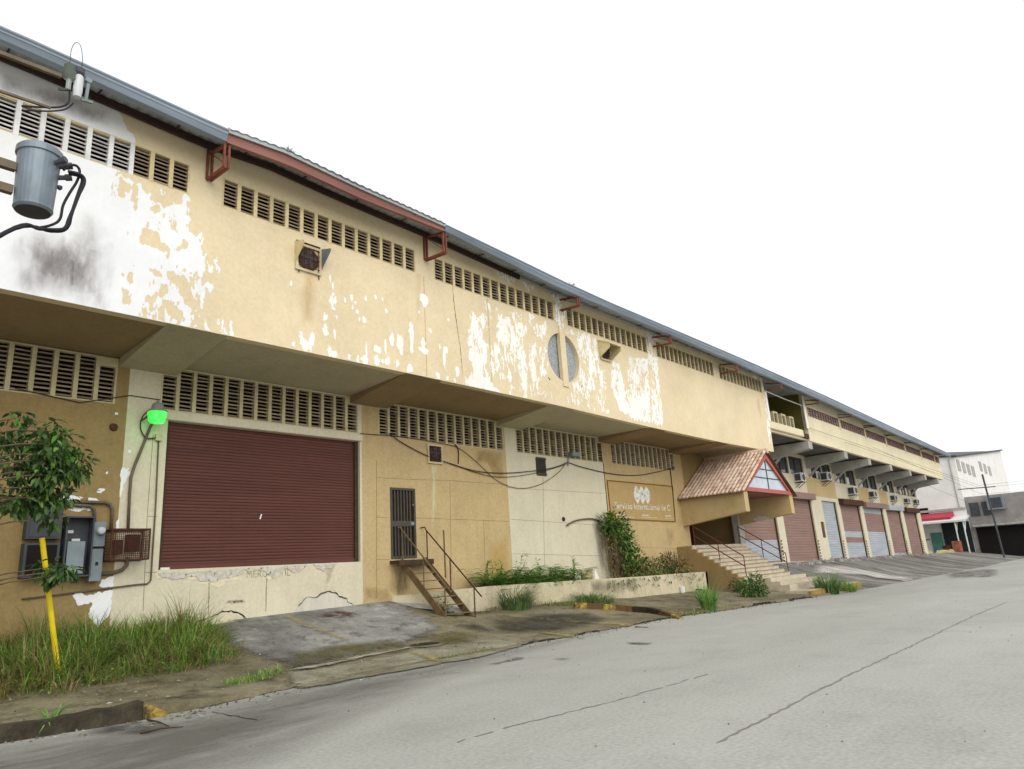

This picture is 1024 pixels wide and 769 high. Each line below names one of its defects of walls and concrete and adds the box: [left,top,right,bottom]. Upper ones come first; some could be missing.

peeling [0,61,136,143]
peeling [0,130,234,336]
damp [42,252,83,279]
peeling [291,274,663,427]
peeling [73,576,114,626]
spalling [155,562,340,588]
crack [299,591,352,605]